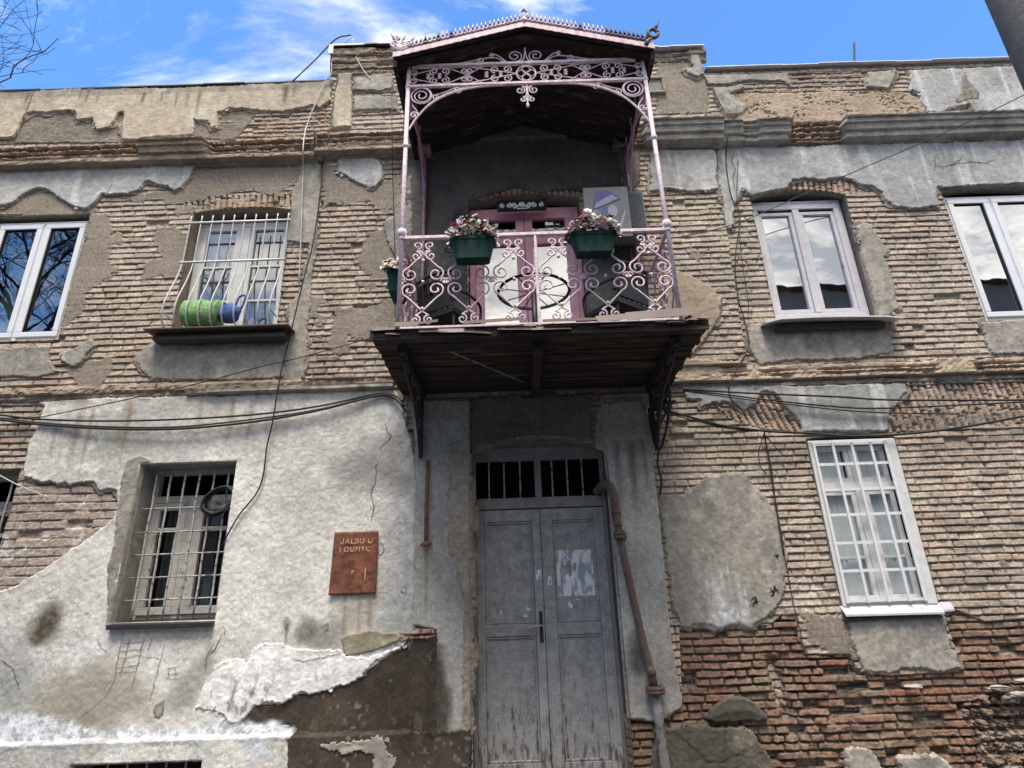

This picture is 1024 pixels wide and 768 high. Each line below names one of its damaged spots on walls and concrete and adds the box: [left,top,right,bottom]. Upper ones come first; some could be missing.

peeling [0,73,405,145]
peeling [680,49,1024,119]
peeling [132,159,323,383]
peeling [383,127,1024,316]
peeling [657,221,903,373]
flaking render [0,481,118,587]
crack [371,424,392,556]
peeling [195,627,435,723]
peeling [320,735,396,768]
spalling [623,611,1024,768]